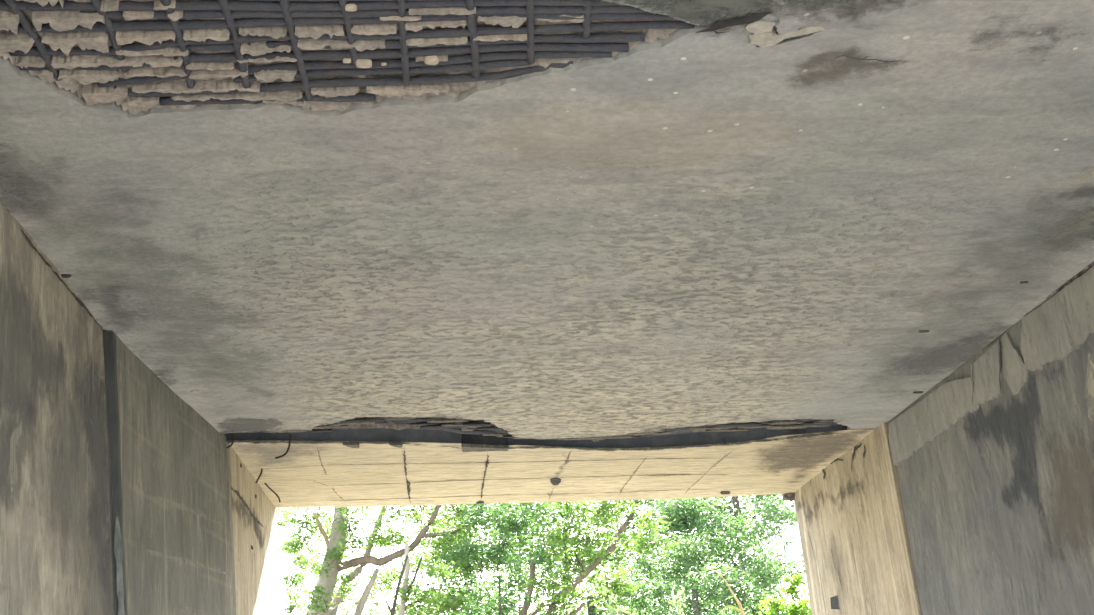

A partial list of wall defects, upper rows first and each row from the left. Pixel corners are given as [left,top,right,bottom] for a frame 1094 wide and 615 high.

spalling [0,0,695,115]
peeling [745,15,825,48]
water stain [9,419,24,501]
water stain [76,354,110,596]
crack [403,451,433,503]
crack [461,455,489,498]
spalling [220,417,847,459]
crack [620,453,730,493]
water stain [760,431,866,482]
water stain [964,373,1094,558]